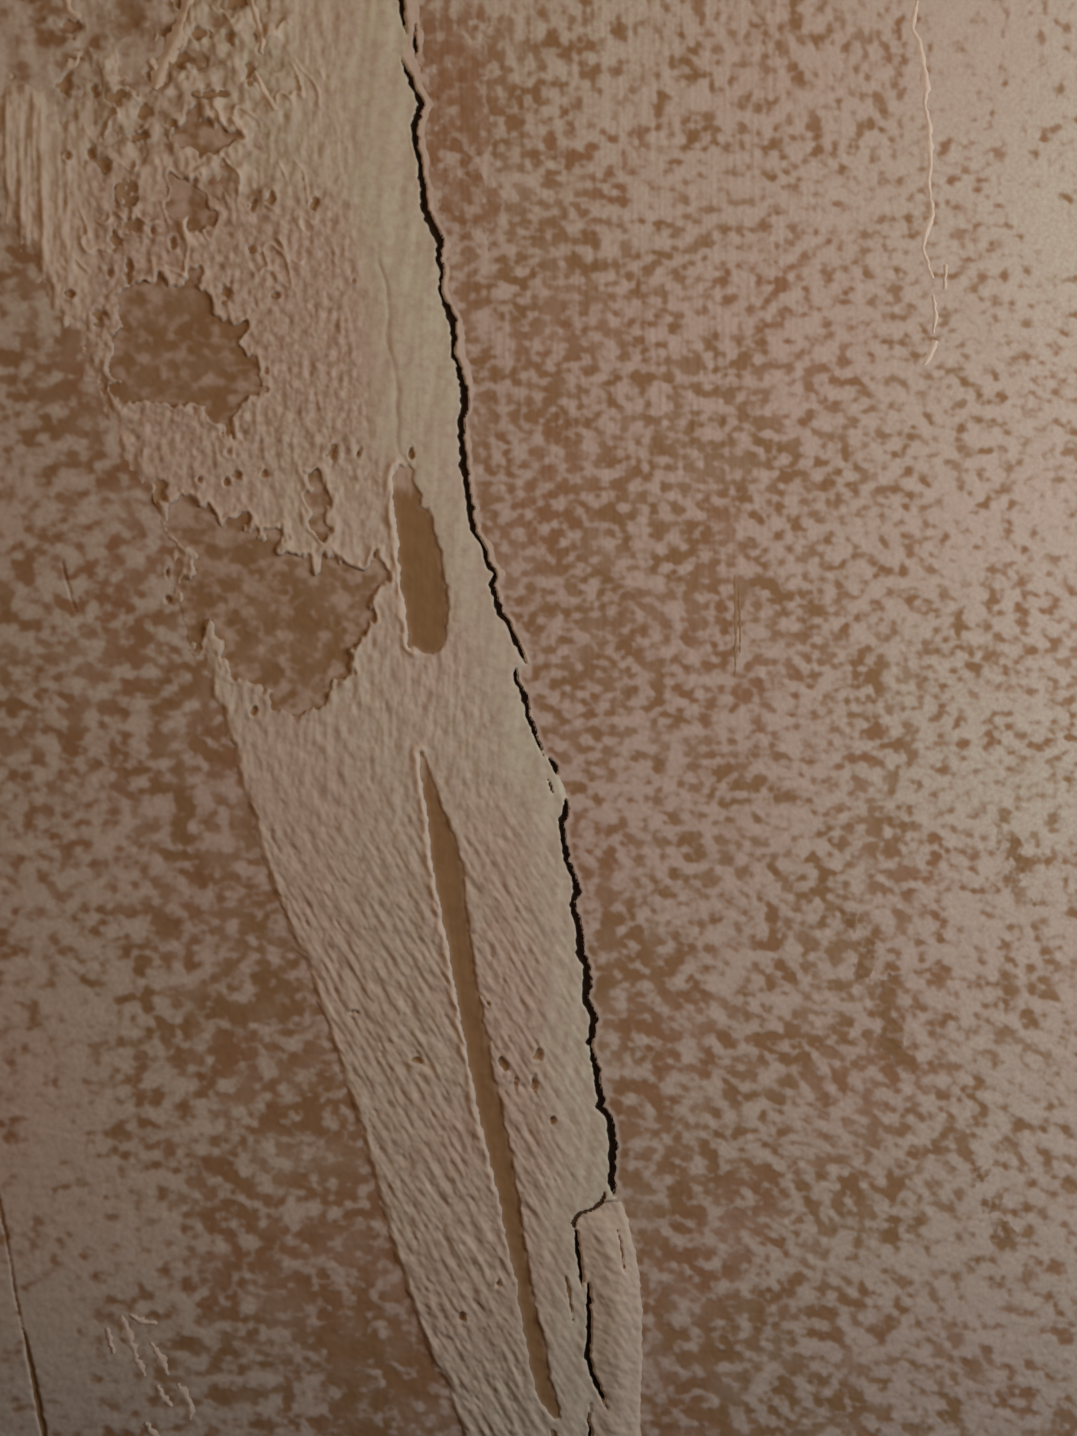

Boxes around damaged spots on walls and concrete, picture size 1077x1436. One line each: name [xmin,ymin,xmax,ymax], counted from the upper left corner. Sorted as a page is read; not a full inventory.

spalling [55,73,71,98]
spalling [90,85,128,106]
peeling [62,148,268,454]
peeling [121,89,240,157]
spalling [169,26,233,70]
spalling [247,191,276,209]
crack [909,0,948,365]
peeling [152,444,449,716]
crack [398,0,619,1436]
hole [420,753,560,1436]